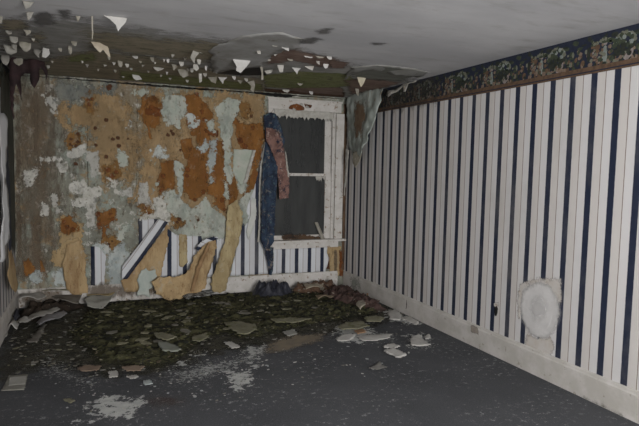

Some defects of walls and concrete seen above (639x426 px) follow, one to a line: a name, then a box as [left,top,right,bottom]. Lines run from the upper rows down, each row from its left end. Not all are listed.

peeling [1,30,53,69]
peeling [41,93,59,114]
peeling [91,15,153,97]
peeling [132,51,332,93]
peeling [386,80,417,97]
damp [0,10,410,280]
peeling [160,95,256,226]
peeling [22,143,103,228]
peeling [92,145,226,284]
peeling [29,267,66,287]
flaking render [137,268,157,297]